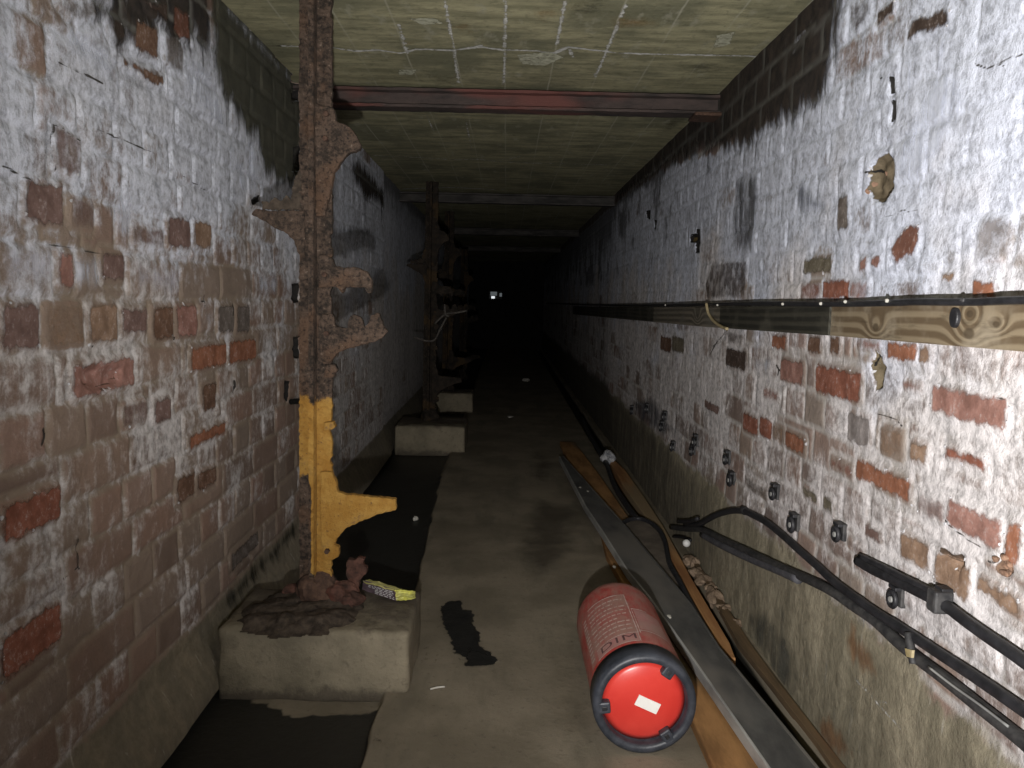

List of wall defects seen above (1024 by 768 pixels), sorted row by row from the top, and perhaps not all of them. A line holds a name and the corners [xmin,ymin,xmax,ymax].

water stain [93,0,300,186]
water stain [518,52,563,66]
crack [333,1,756,83]
water stain [616,0,841,201]
water stain [736,181,755,244]
spalling [865,153,895,202]
peeling [772,333,929,445]